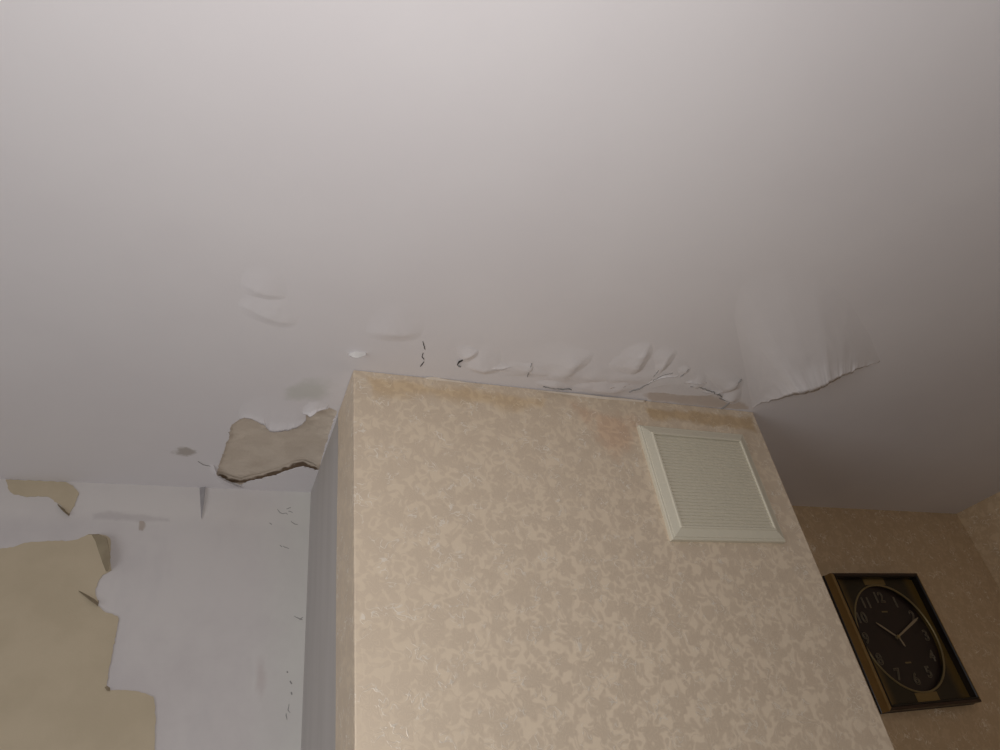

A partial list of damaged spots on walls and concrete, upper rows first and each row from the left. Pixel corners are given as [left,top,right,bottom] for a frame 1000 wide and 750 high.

spalling [209,395,337,489]
damp [274,366,762,479]